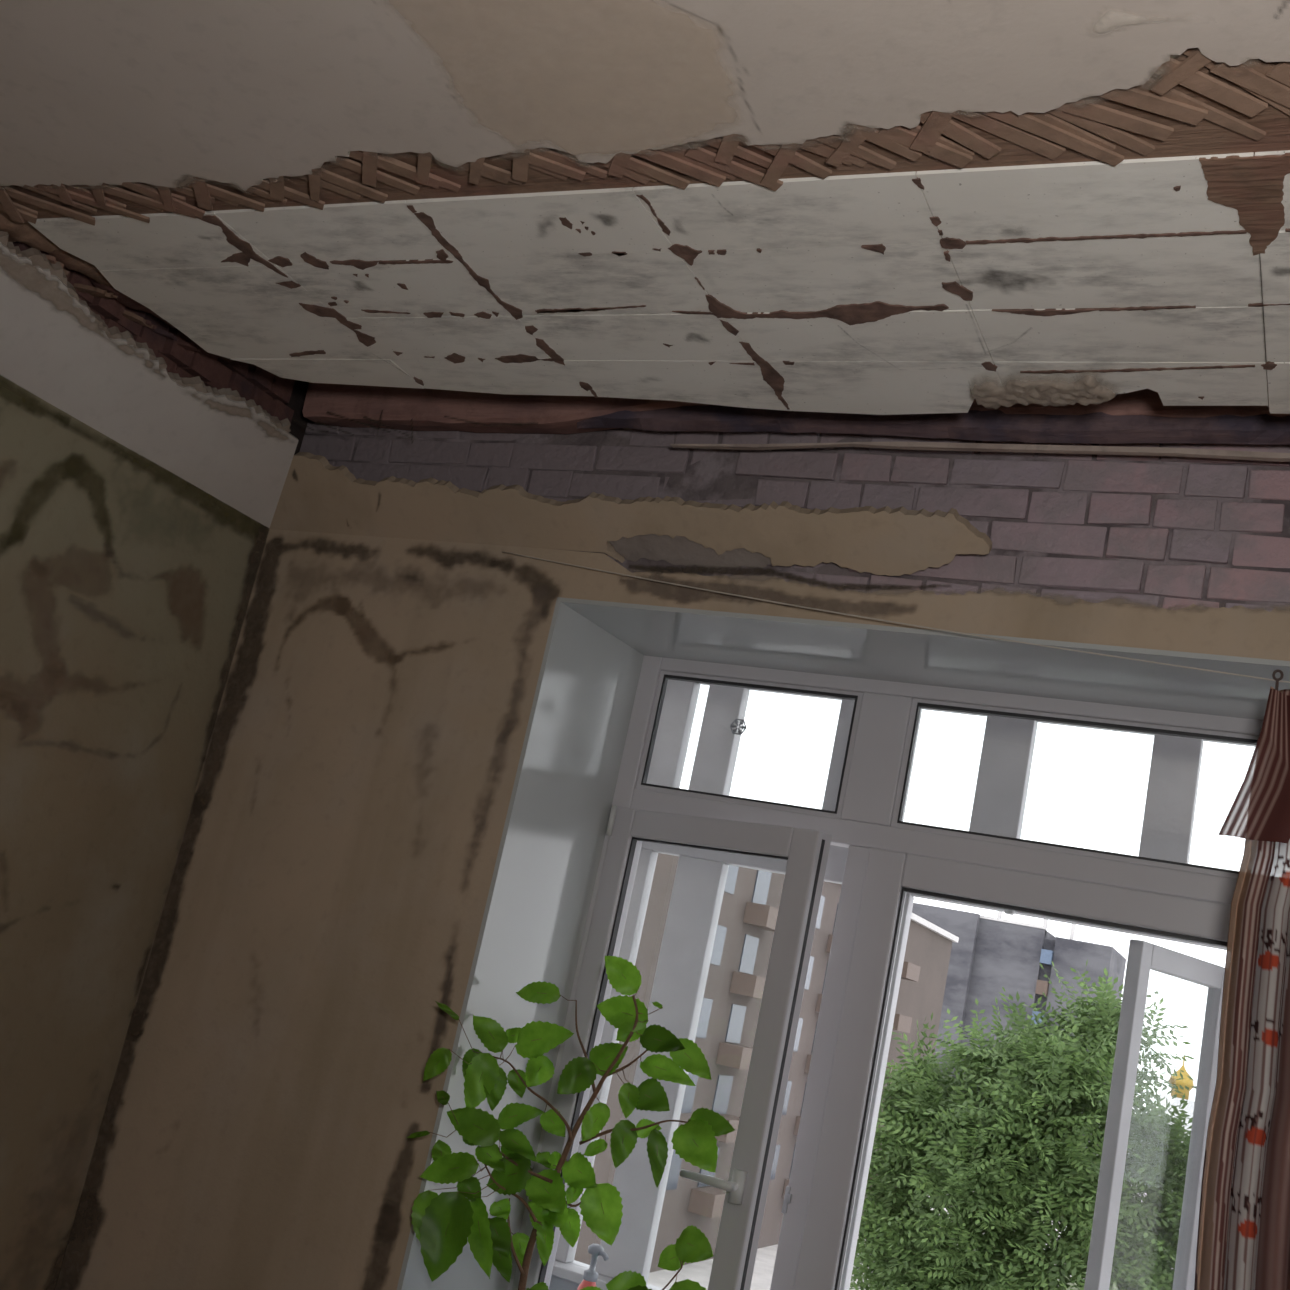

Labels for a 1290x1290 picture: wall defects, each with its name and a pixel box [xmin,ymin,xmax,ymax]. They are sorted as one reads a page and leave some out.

peeling [196,205,646,365]
peeling [636,195,973,410]
peeling [930,153,1290,262]
flaking render [0,241,1290,614]
water stain [294,597,404,661]
water stain [410,547,558,615]
water stain [0,377,375,1290]